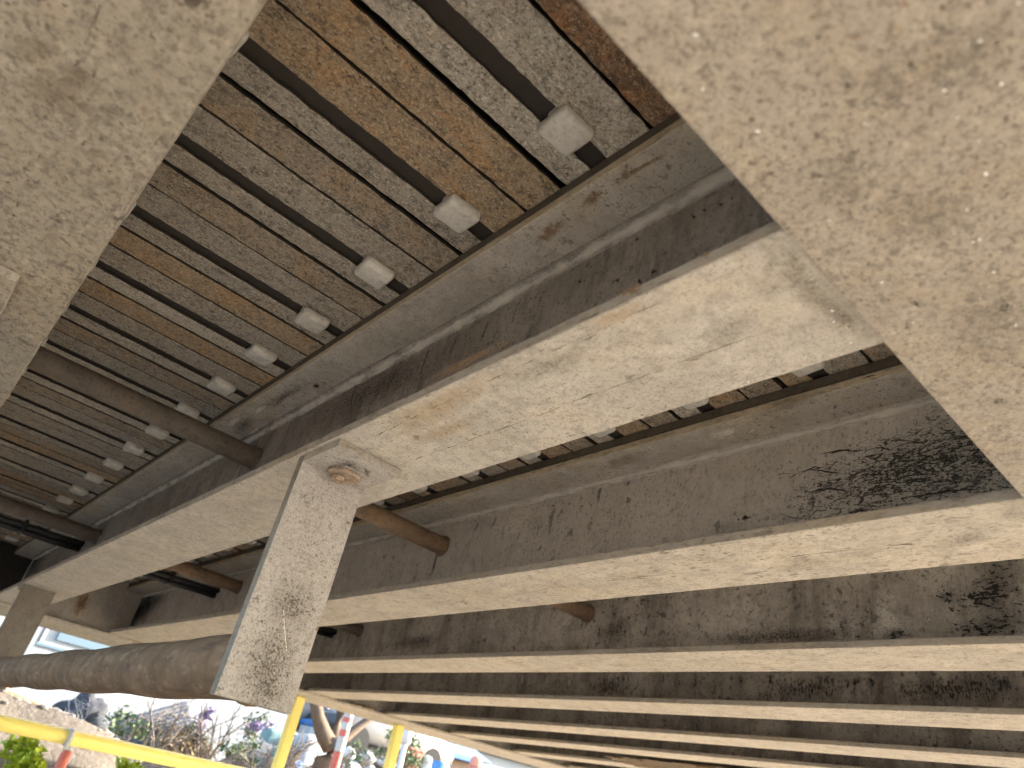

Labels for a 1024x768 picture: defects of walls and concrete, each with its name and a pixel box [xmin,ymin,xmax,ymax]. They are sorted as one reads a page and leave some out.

water stain [933,560,1023,637]